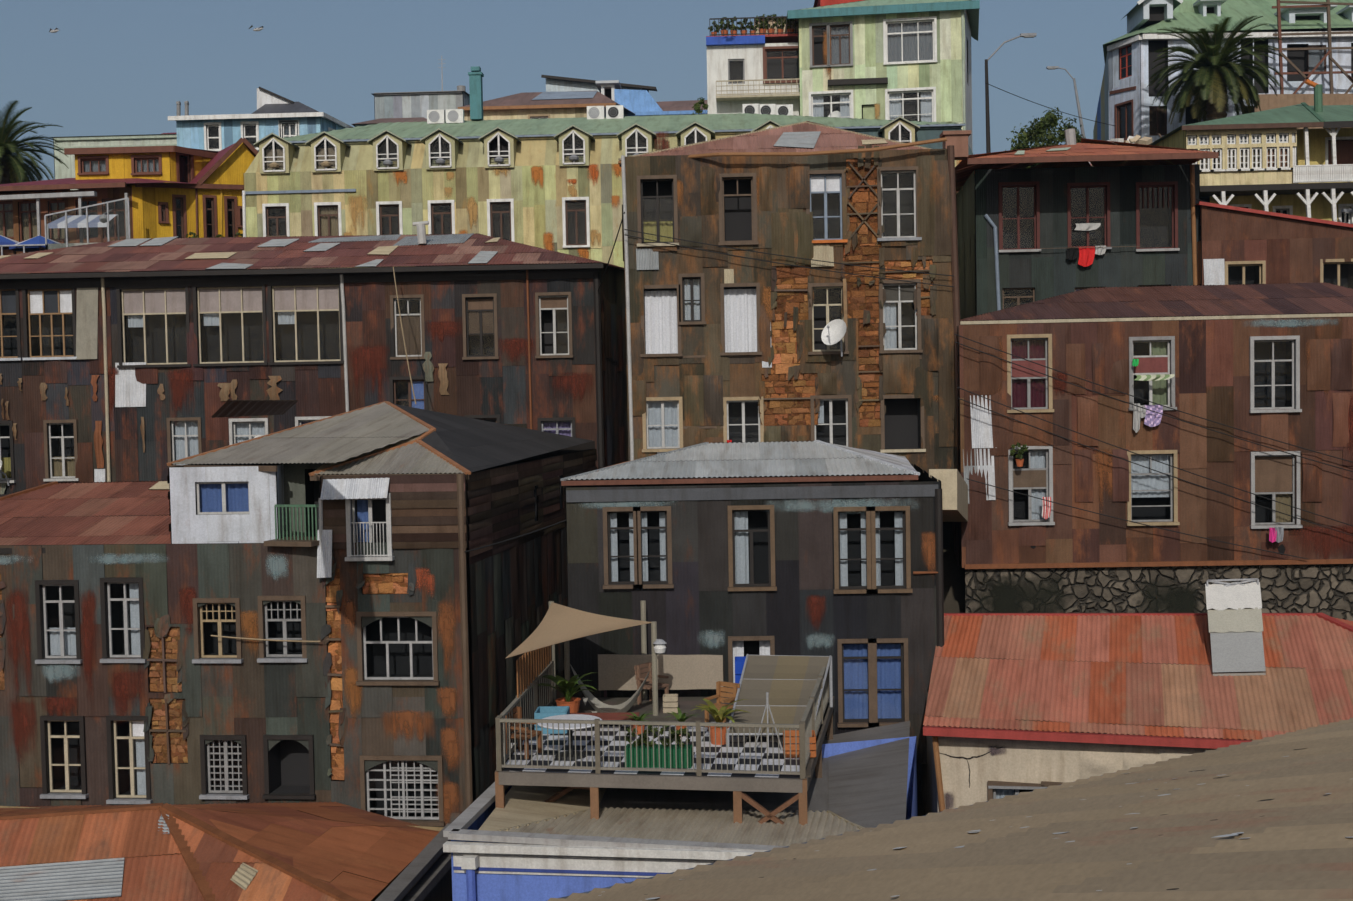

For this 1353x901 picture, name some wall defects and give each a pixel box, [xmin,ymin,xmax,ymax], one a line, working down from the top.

rust [655,132,669,150]
rust [531,166,543,187]
rust [567,164,622,197]
rust [415,569,455,663]
rust [81,593,95,684]
rust [384,687,458,765]
rust [438,782,459,821]